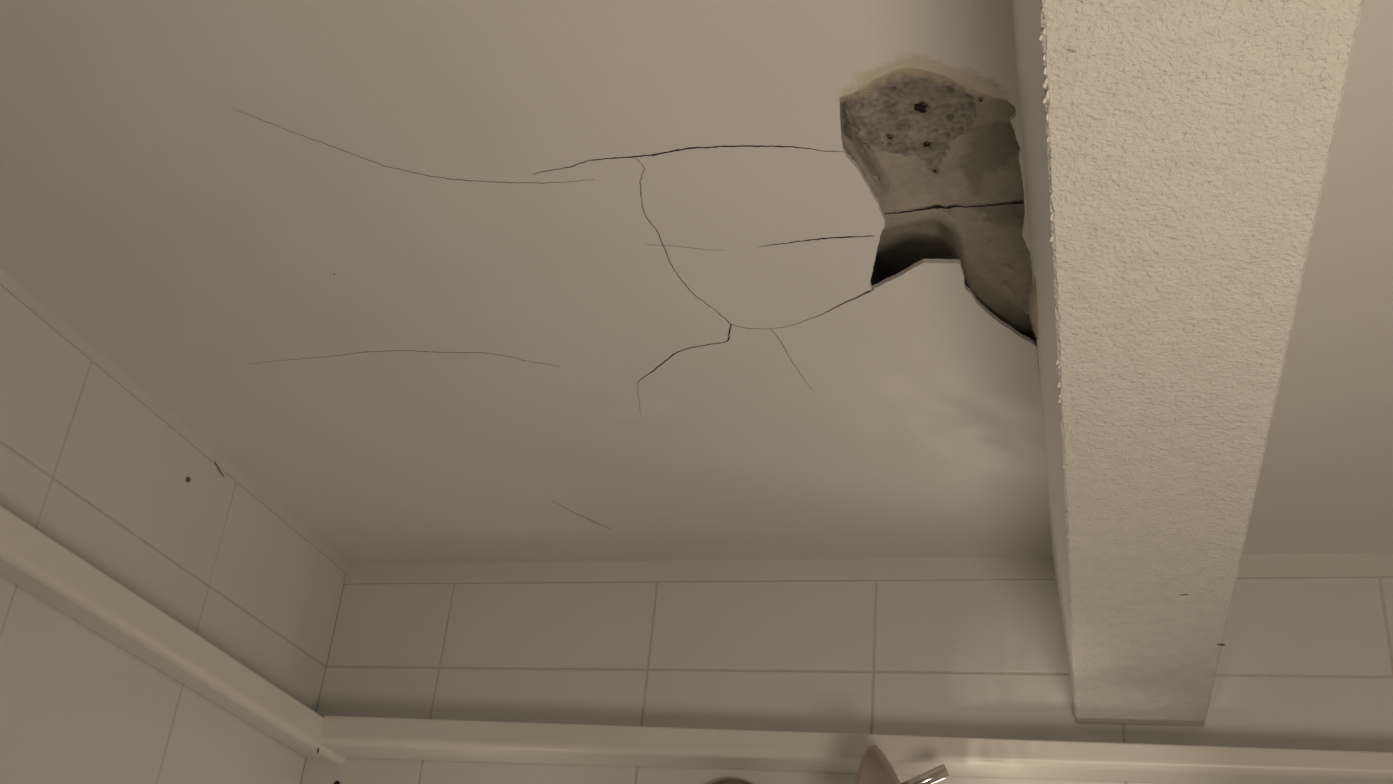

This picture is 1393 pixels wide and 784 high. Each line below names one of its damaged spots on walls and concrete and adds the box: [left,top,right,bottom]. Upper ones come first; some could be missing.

crack [235,109,874,415]
spalling [840,68,1038,343]